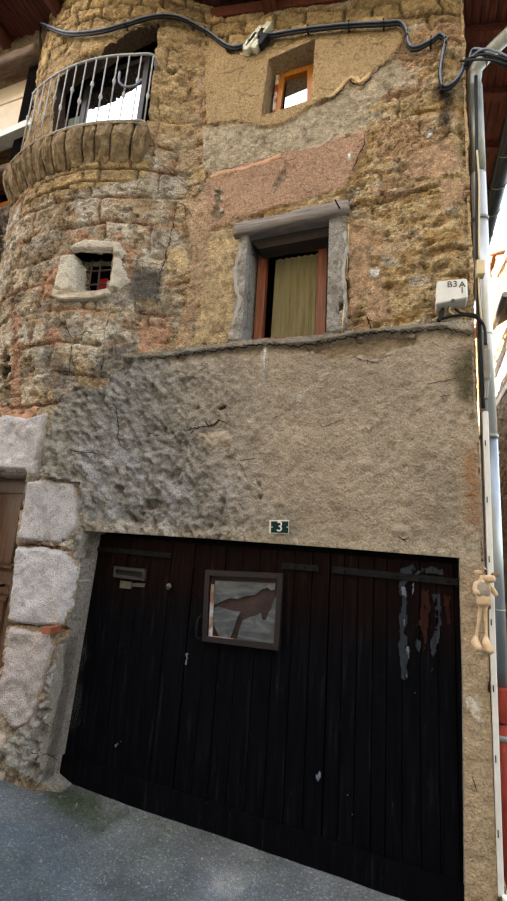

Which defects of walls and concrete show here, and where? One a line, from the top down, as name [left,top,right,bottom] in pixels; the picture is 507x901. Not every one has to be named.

peeling [272,75,280,112]
peeling [326,72,372,98]
damp [456,350,474,402]
crack [70,390,126,458]
crack [180,419,227,433]
peeling [398,564,451,680]